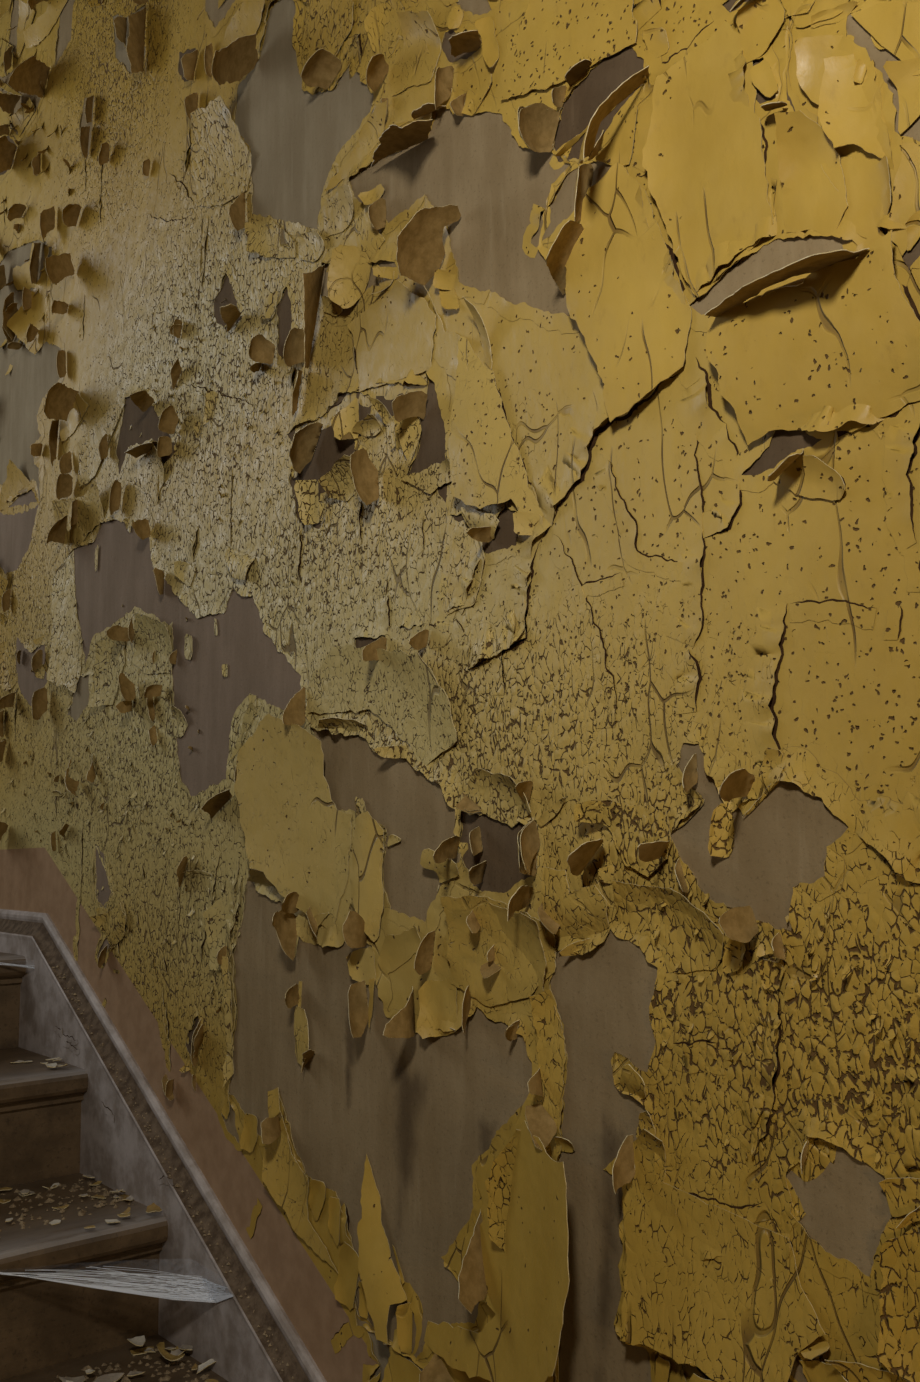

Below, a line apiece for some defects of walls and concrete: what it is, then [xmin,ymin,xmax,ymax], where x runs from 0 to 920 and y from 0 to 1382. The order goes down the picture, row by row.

peeling [77,89,110,224]
crack [632,20,777,300]
peeling [0,196,26,233]
peeling [208,260,246,338]
peeling [0,204,89,626]
peeling [164,358,265,449]
crack [458,357,742,728]
crack [737,401,920,769]
peeling [567,839,603,876]
peeling [574,800,672,877]
peeling [49,1175,162,1229]
peeling [127,1335,218,1382]